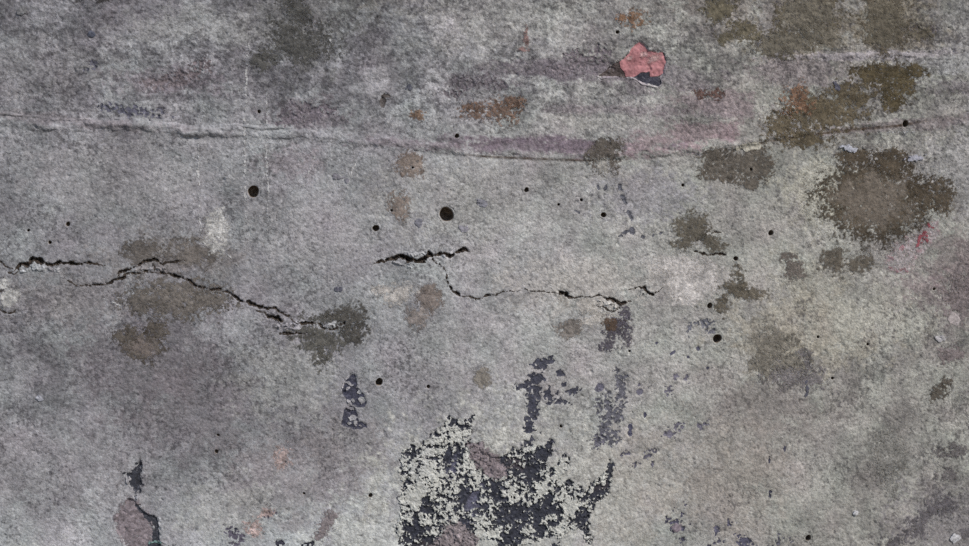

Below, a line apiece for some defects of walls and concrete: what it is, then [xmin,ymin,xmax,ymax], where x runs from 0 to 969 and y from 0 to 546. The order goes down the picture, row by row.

peeling [540,40,668,88]
leakage [696,0,958,283]
crack [0,256,345,336]
crack [374,247,663,313]
peeling [341,373,367,430]
peeling [396,355,657,546]
peeling [661,422,685,439]
peeling [113,459,176,546]
peeling [223,524,245,546]
peeling [301,509,338,546]